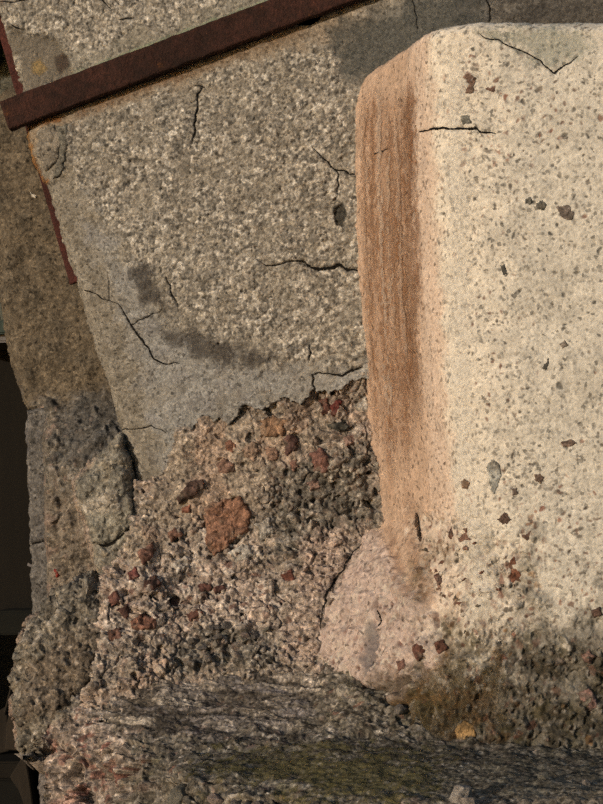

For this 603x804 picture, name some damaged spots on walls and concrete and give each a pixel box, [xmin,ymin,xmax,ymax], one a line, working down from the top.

crack [479,0,578,74]
rust [26,117,61,184]
crack [192,85,205,142]
crack [419,126,495,134]
crack [257,259,358,272]
rust [360,98,418,384]
crack [84,277,179,365]
spalling [71,372,385,723]
crack [320,544,361,630]